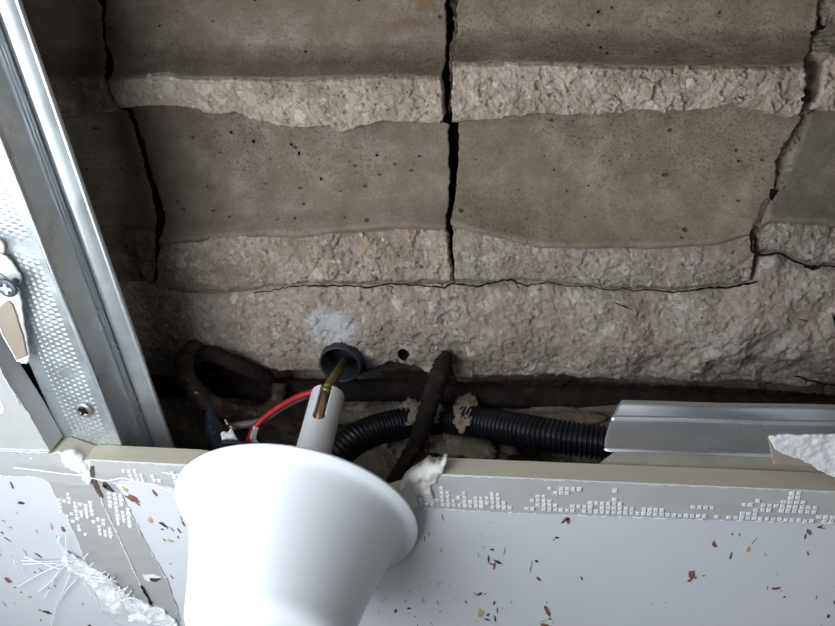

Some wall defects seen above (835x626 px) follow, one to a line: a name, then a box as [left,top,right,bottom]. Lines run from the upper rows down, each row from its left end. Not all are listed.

crack [98,0,113,81]
spalling [48,54,835,134]
crack [121,107,165,282]
crack [253,0,758,310]
spalling [100,223,835,292]
crack [749,228,835,271]